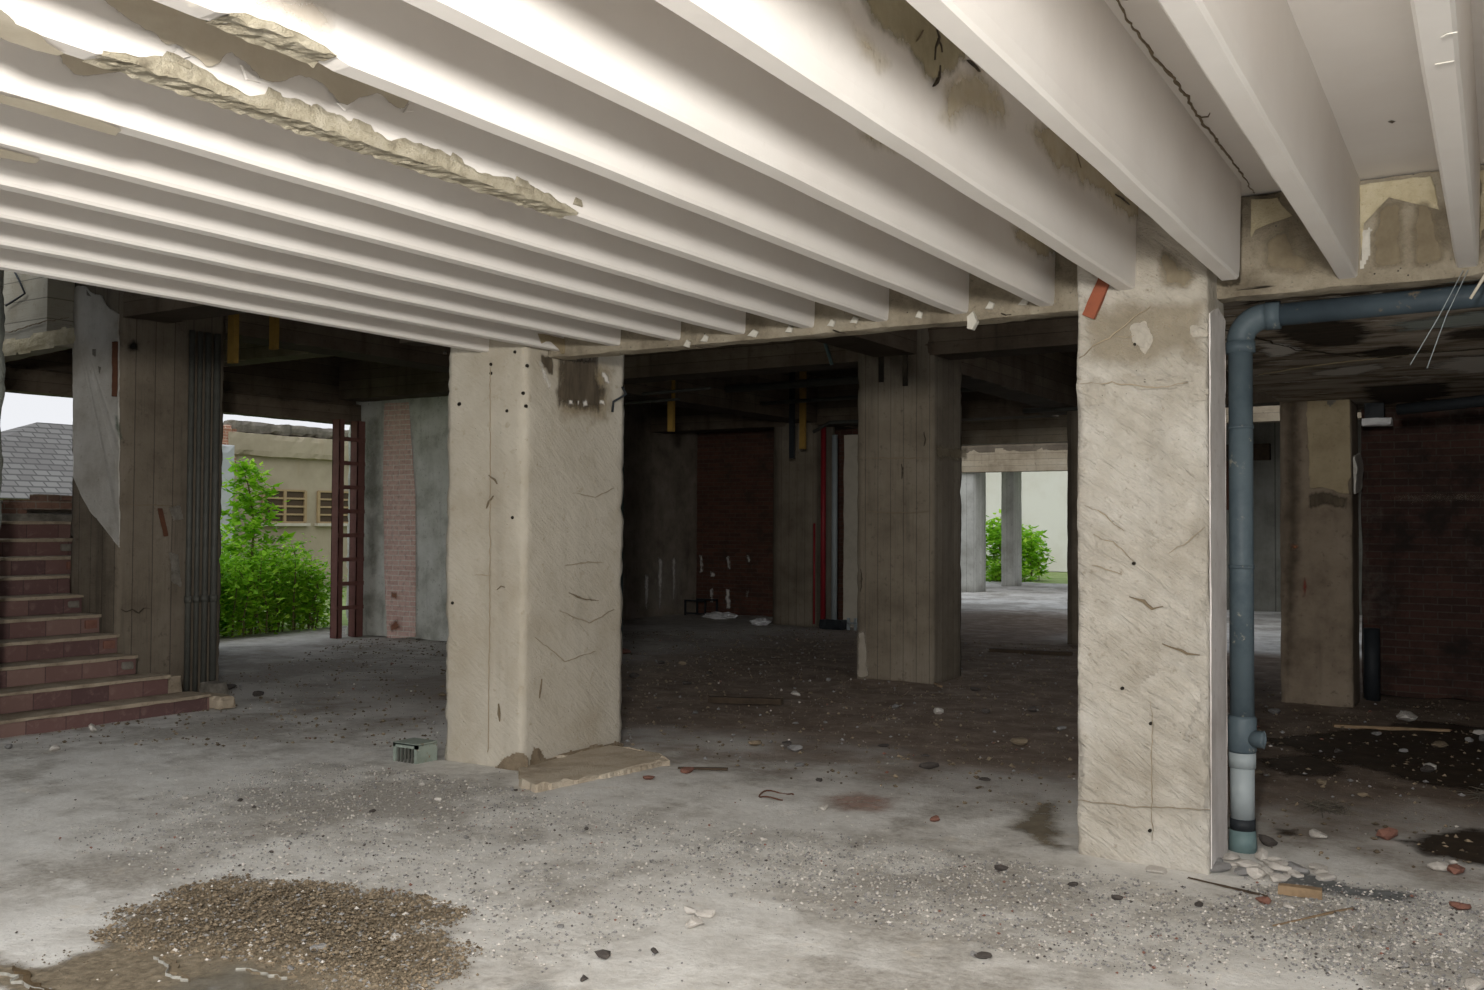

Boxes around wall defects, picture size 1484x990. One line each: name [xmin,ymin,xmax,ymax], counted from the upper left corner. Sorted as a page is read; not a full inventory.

spalling [0,0,583,219]
crack [1116,0,1255,194]
peeling [1250,198,1292,237]
peeling [1359,176,1439,269]
leakage [1274,320,1417,359]